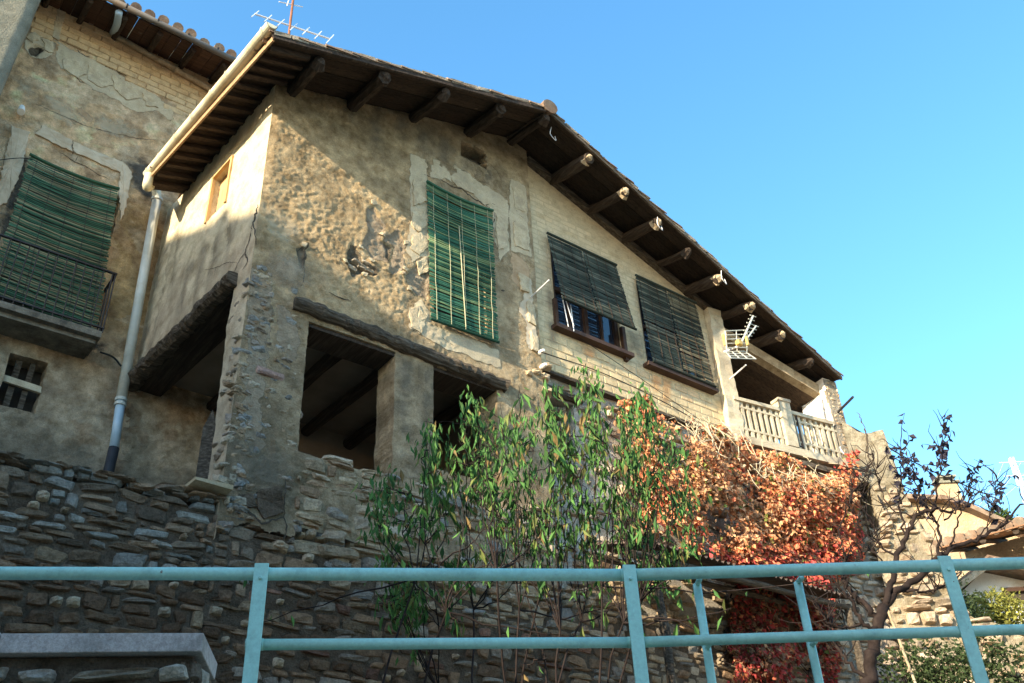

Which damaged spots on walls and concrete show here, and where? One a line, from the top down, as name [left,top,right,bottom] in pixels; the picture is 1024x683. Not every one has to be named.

crack [37,104,151,179]
crack [205,204,258,274]
flaking render [341,154,539,367]
flaking render [238,486,284,520]